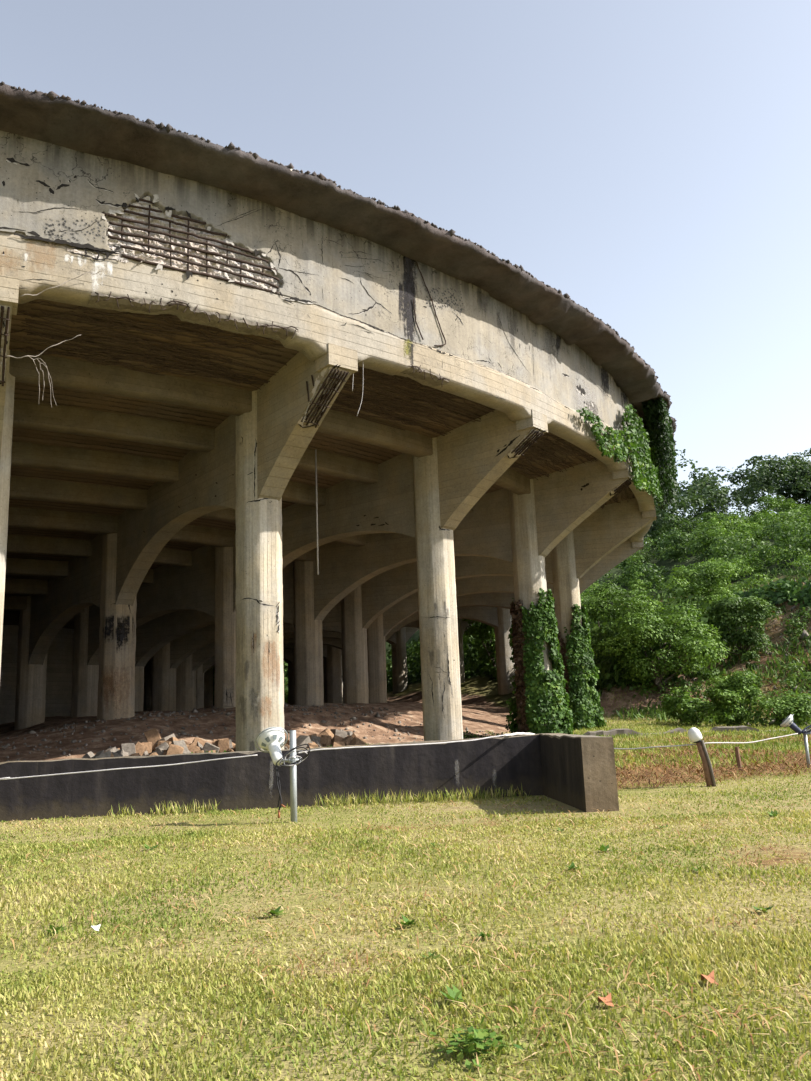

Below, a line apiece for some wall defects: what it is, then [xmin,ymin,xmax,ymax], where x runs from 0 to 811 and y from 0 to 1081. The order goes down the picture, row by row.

crack [12,179,122,214]
spalling [0,305,10,386]
spalling [43,193,283,295]
spalling [88,283,299,340]
crack [211,208,400,333]
leakage [399,256,416,364]
spalling [297,364,349,430]
leakage [103,615,134,648]